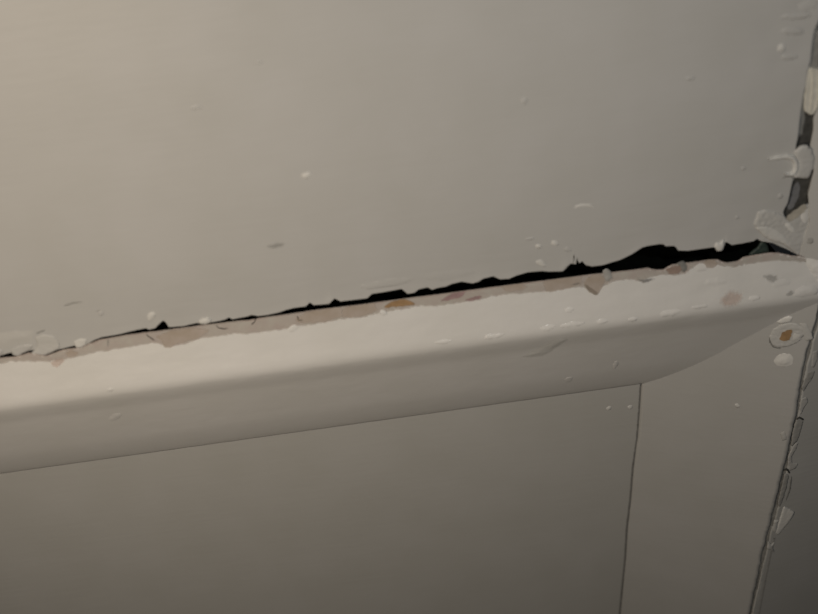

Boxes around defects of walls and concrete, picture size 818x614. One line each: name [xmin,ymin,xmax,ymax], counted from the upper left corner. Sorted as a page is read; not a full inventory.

crack [809,24,818,68]
peeling [768,144,815,180]
crack [783,172,812,217]
crack [796,98,815,148]
crack [0,239,776,358]
peeling [0,203,813,363]
crack [618,386,641,614]
crack [749,310,818,614]